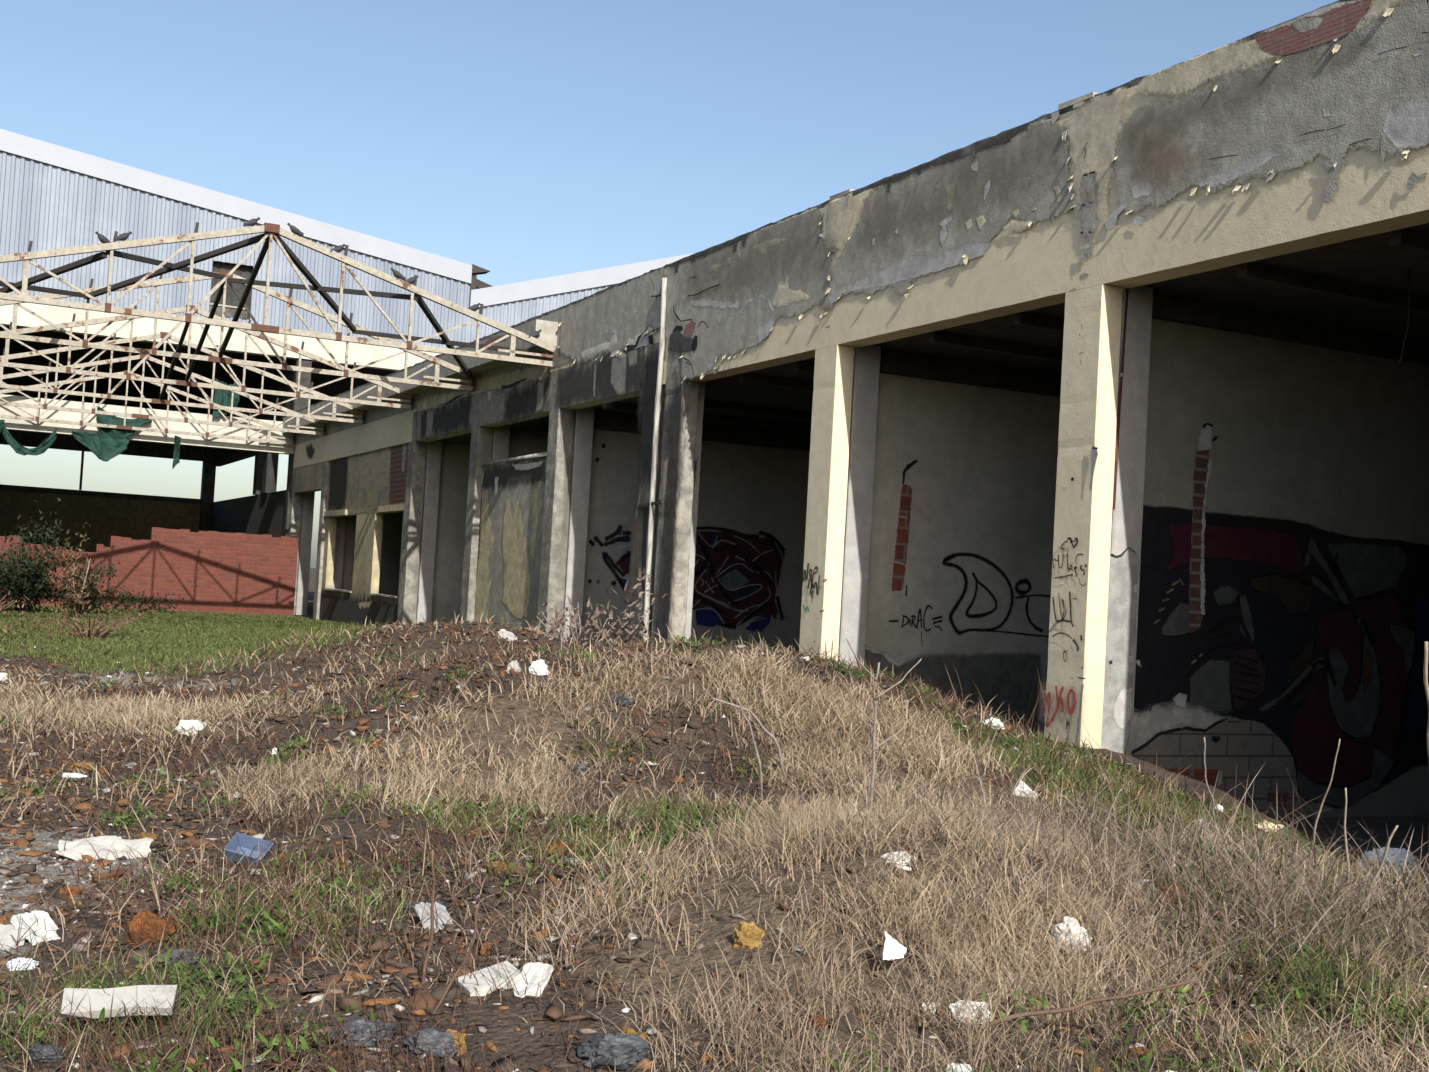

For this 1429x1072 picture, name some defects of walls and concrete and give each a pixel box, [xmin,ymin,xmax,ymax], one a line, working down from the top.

peeling [558,0,1429,383]
flaking render [1101,547,1298,817]